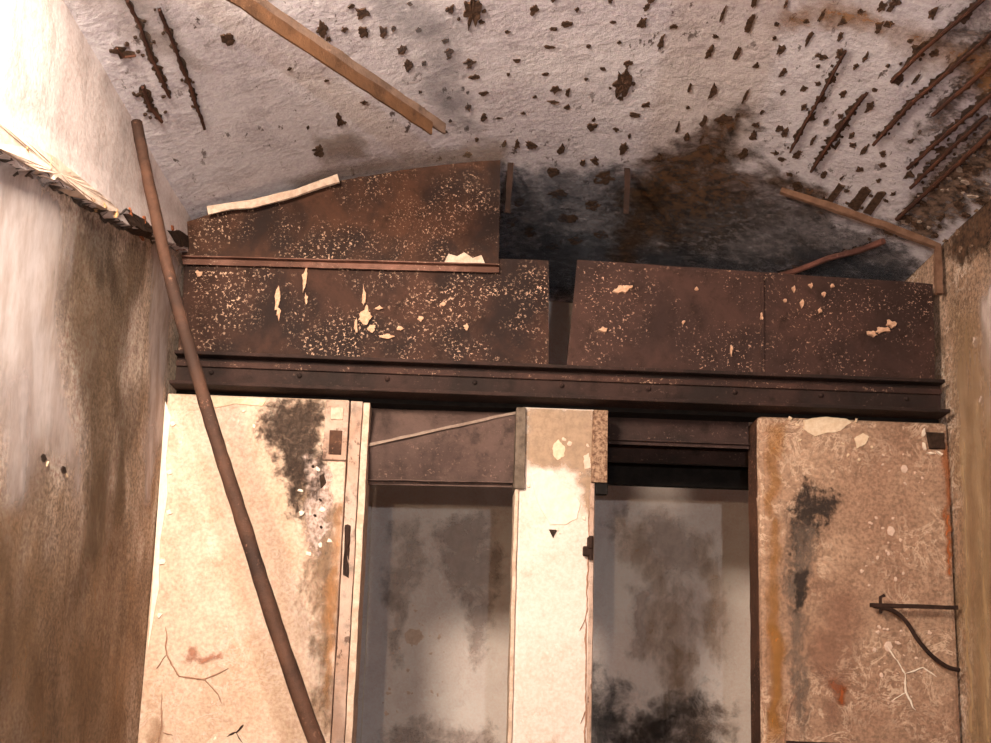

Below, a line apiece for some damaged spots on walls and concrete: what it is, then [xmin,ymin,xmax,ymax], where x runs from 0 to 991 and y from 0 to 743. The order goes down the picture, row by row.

spalling [341,4,396,38]
spalling [445,0,486,31]
spalling [109,0,206,130]
spalling [609,60,635,101]
water stain [0,160,171,743]
water stain [257,398,325,519]
peeling [788,416,925,495]
spalling [921,428,945,456]
water stain [300,505,342,728]
water stain [793,569,809,612]
rust [767,586,783,736]
water stain [592,706,609,727]